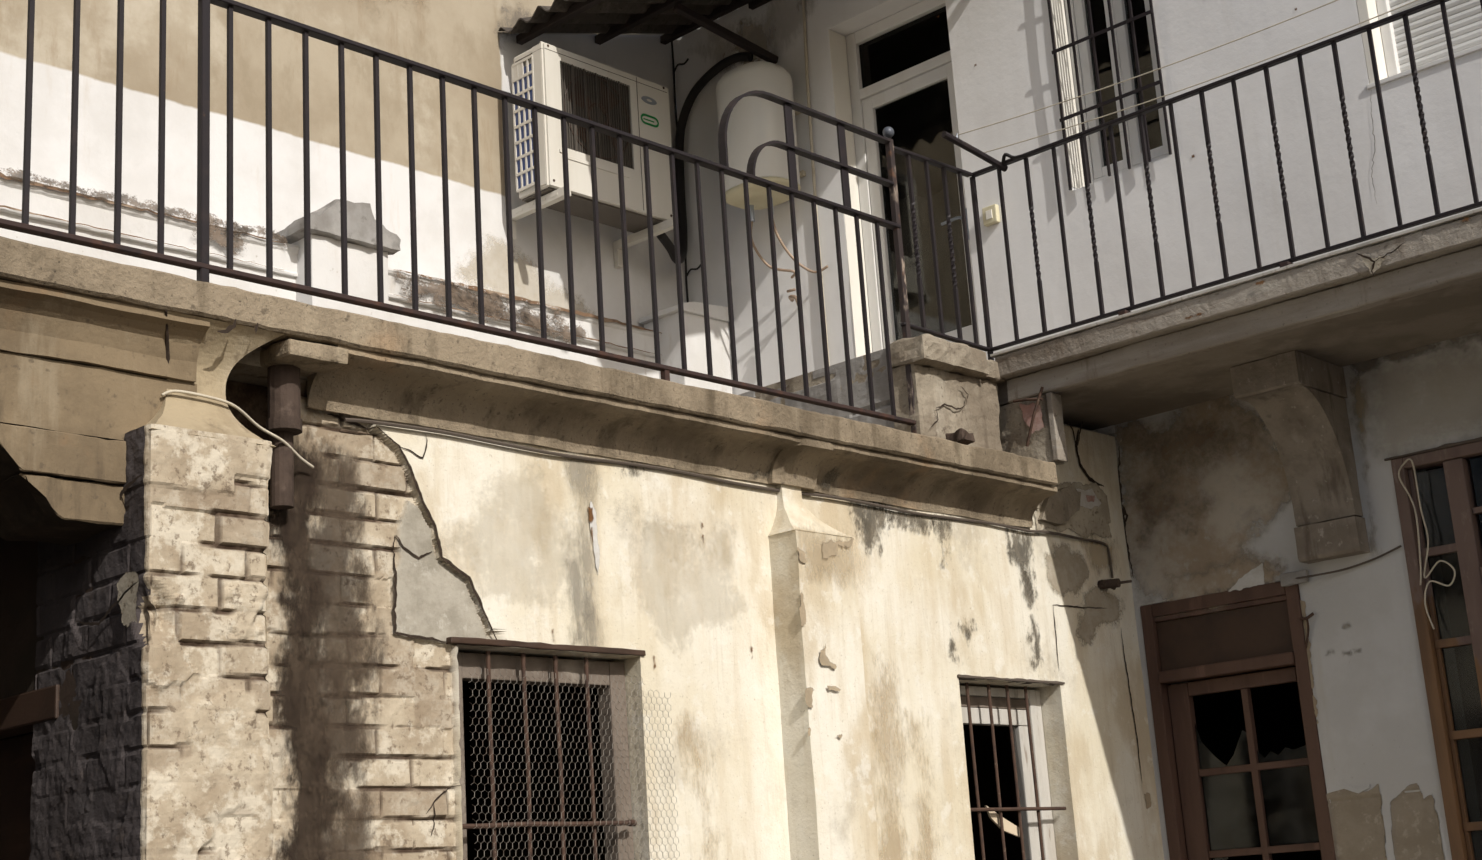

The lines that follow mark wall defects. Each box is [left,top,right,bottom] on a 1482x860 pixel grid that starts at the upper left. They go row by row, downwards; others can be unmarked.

spalling [117,571,139,627]
damp [265,445,384,860]
damp [568,452,600,645]
damp [850,501,953,566]
damp [1007,528,1040,669]
crack [1053,604,1142,779]
crack [1067,421,1134,578]
peeling [1228,563,1309,592]
peeling [1326,783,1445,860]